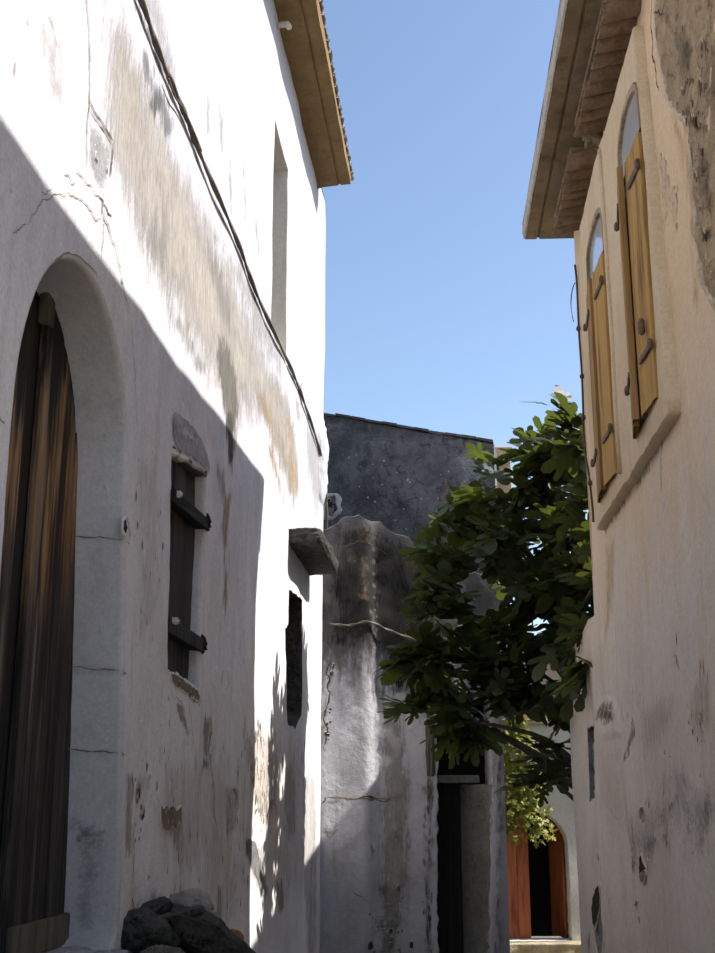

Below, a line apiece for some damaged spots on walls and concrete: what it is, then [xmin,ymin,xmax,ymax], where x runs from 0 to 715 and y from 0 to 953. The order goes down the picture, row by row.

spalling [654,0,715,312]
damp [107,0,303,483]
crack [13,172,138,426]
damp [218,470,230,560]
spalling [169,672,200,742]
crack [323,659,334,752]
peeling [135,761,158,819]
spalling [158,774,198,871]
peeling [214,718,305,911]
crack [312,795,410,864]
spalling [591,880,605,953]